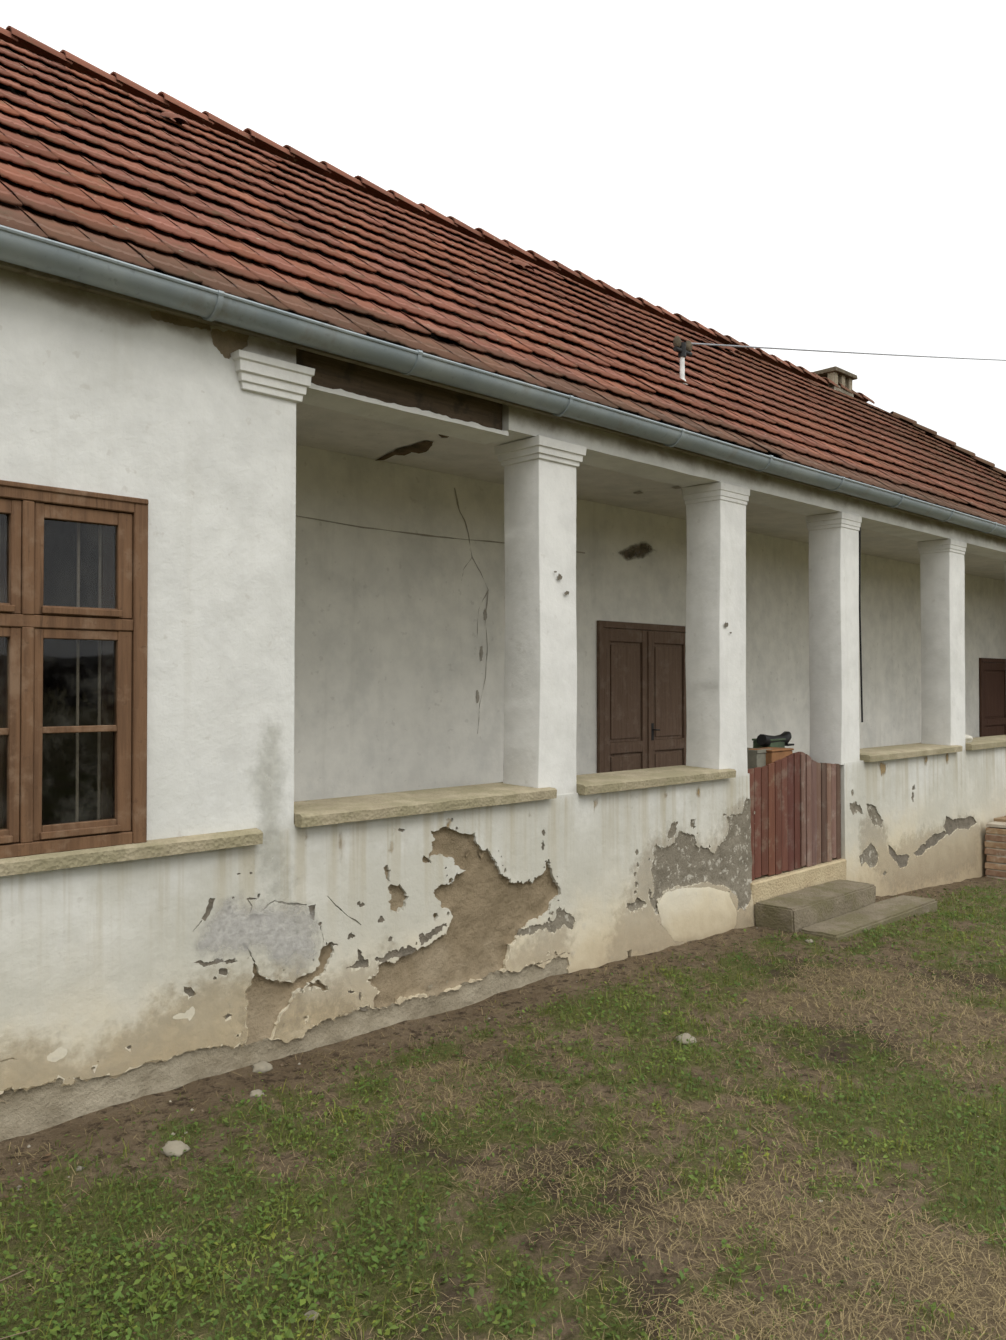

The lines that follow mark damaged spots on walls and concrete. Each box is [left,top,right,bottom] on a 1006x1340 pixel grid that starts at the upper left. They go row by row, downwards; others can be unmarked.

spalling [311,352,503,430]
spalling [375,434,449,461]
crack [297,488,505,734]
spalling [626,797,755,916]
spalling [850,790,883,827]
spalling [859,816,976,876]
spalling [0,827,575,1142]